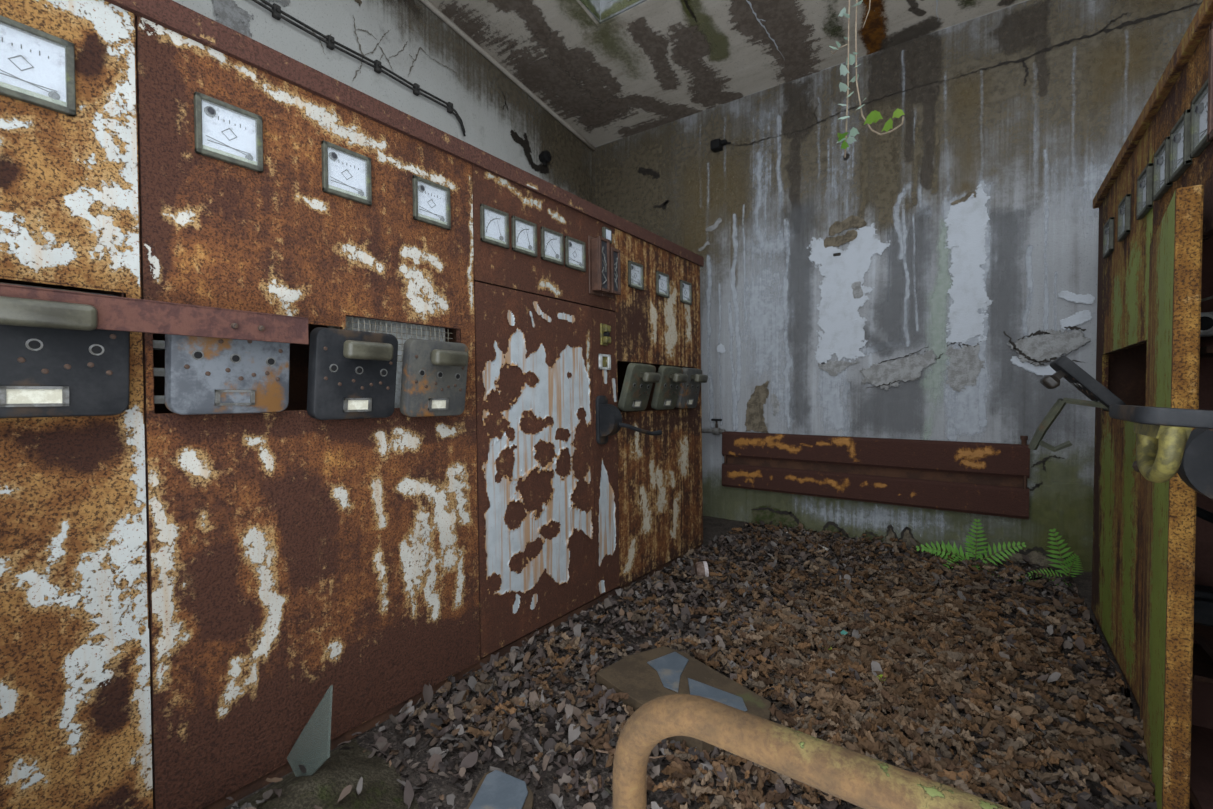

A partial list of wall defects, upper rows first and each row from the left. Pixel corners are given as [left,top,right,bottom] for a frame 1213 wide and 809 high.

leakage [383,0,1203,441]
flaking render [807,215,890,376]
flaking render [944,184,992,394]
leakage [806,503,944,530]